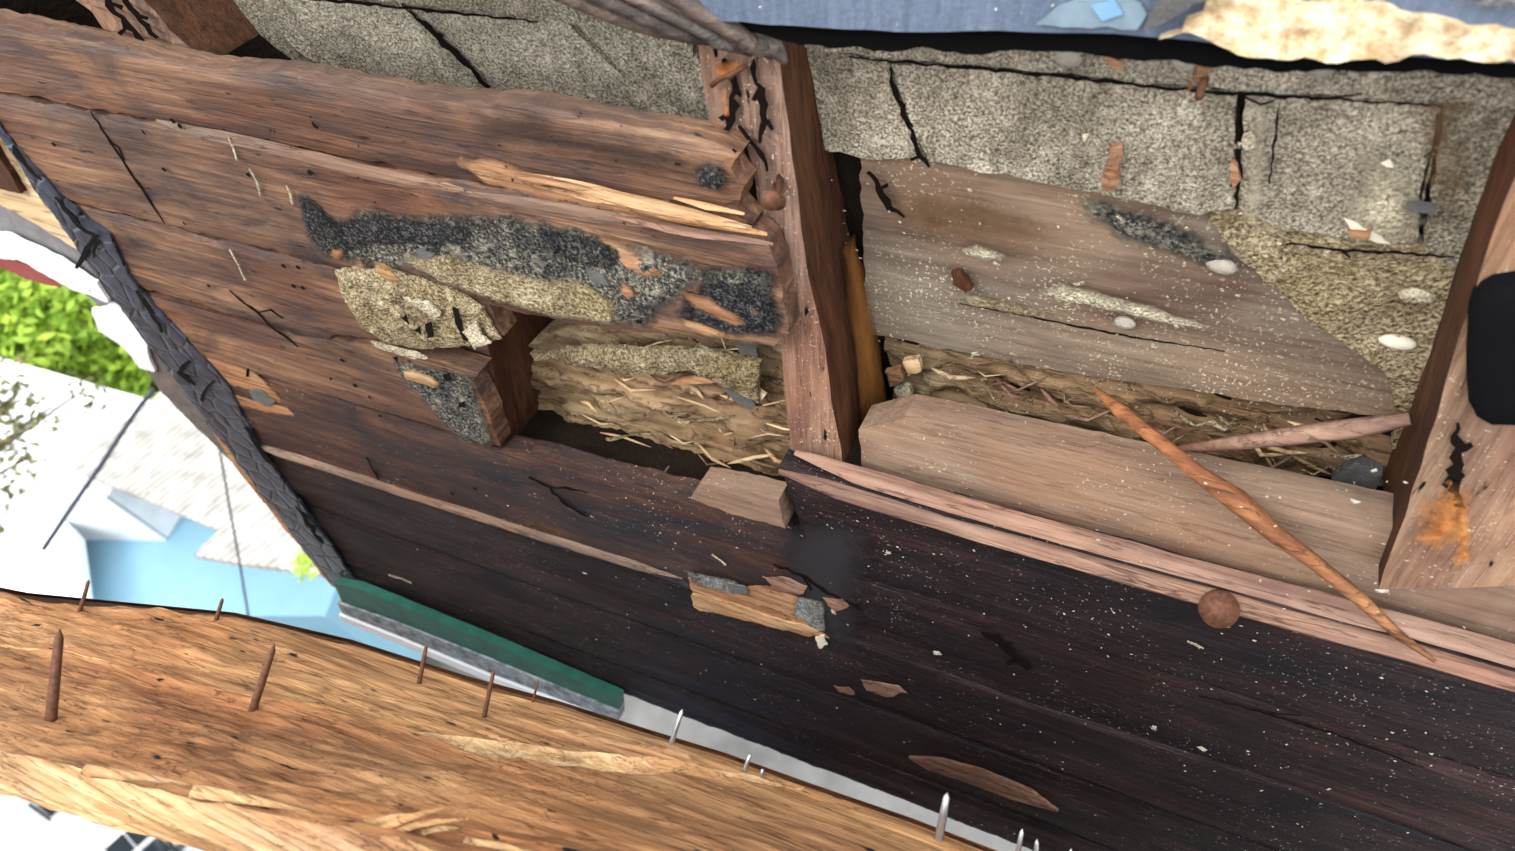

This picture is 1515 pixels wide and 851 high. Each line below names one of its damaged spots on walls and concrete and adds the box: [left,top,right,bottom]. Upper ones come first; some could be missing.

peeling [1036,0,1147,30]
peeling [1159,0,1515,63]
crack [848,56,1454,259]
peeling [586,235,658,298]
spalling [331,248,502,387]
peeling [684,293,761,358]
corrosion [1427,500,1468,560]
peeling [687,572,849,649]